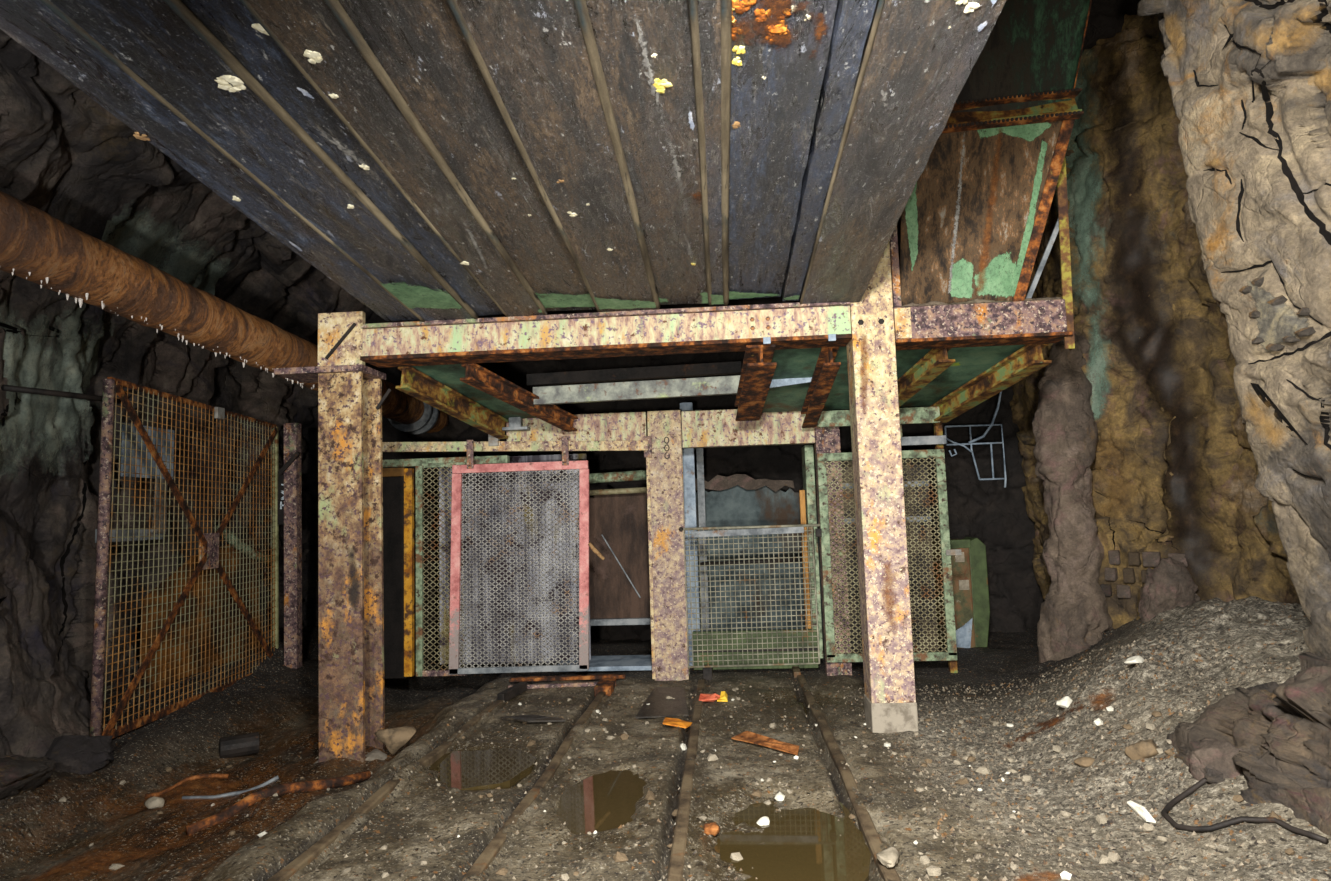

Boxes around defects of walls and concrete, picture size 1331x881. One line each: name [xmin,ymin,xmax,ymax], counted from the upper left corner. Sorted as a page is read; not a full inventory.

rust [732,0,828,58]
leakage [955,0,980,14]
peeling [905,182,919,270]
peeling [950,122,1051,298]
rust [139,535,262,694]
rust [349,552,359,605]
rust [883,564,894,627]